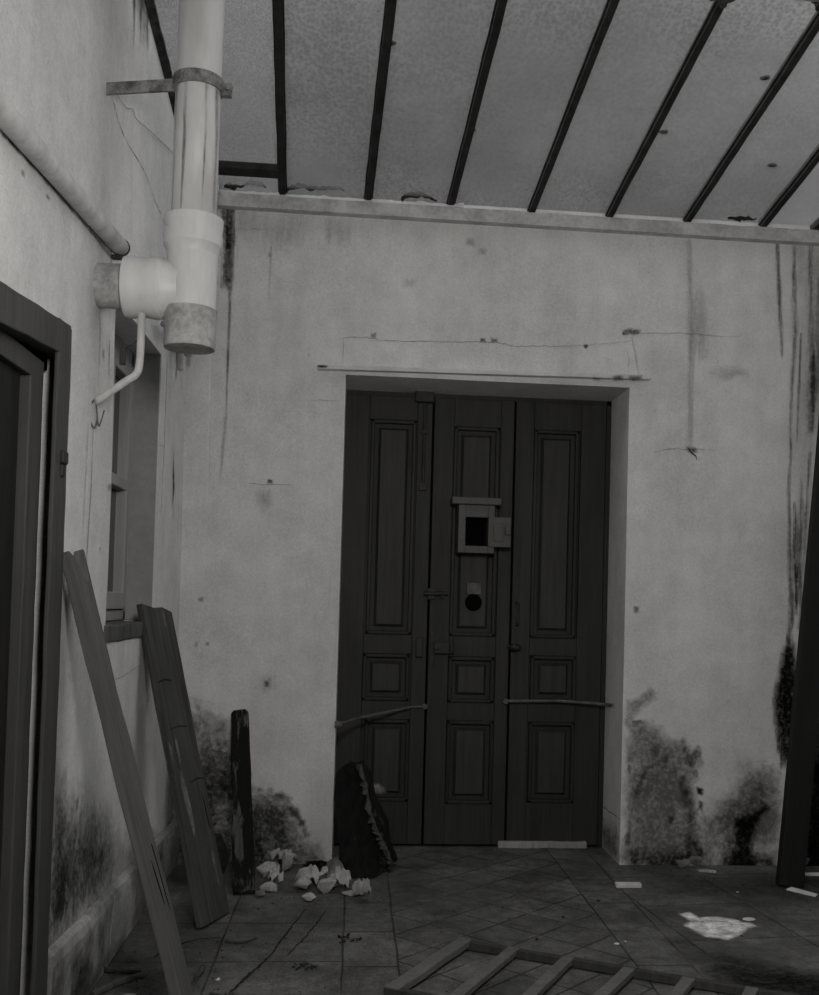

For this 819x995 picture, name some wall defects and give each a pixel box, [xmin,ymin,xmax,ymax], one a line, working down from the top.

leakage [789,506,807,615]
leakage [749,629,796,764]
leakage [253,805,318,864]
leakage [724,784,776,866]
leakage [806,724,819,866]